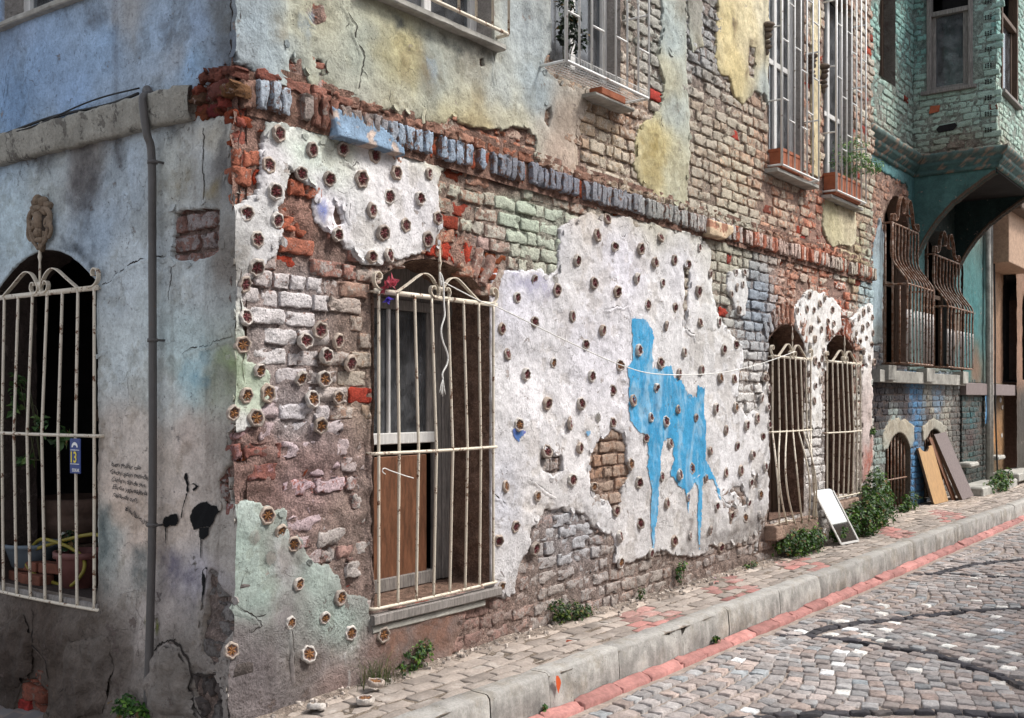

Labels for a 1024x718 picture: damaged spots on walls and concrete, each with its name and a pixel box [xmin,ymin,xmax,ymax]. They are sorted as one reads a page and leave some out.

crack [198,128,206,201]
crack [339,0,368,95]
spalling [540,0,665,188]
spalling [673,0,914,270]
spalling [167,57,836,654]
spalling [699,237,962,528]
spalling [190,556,253,718]